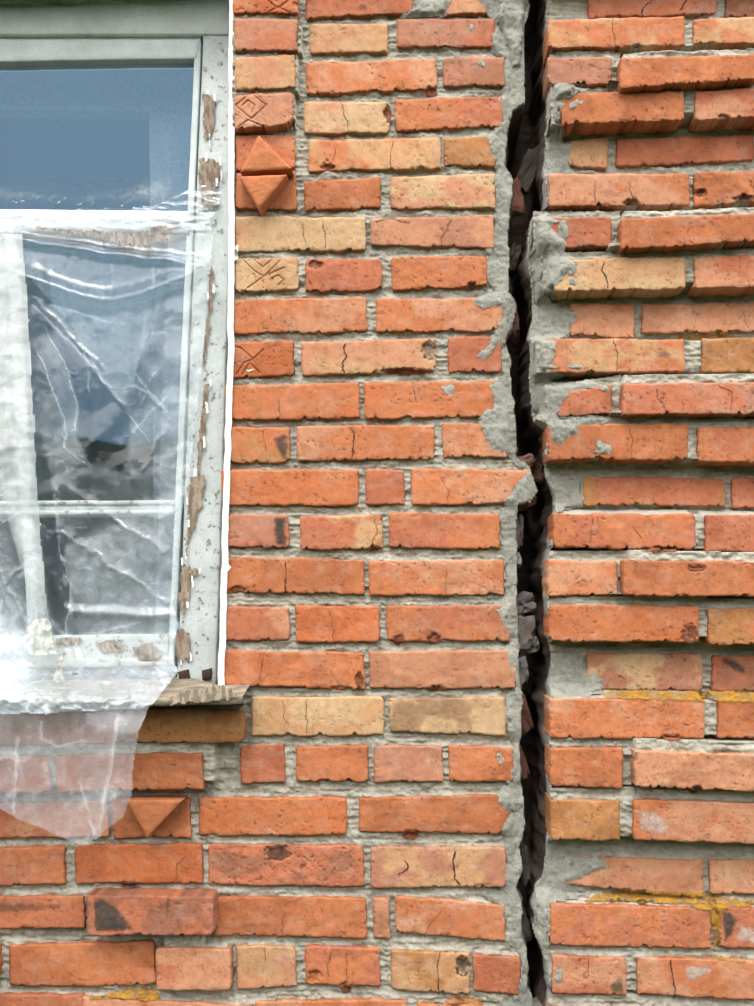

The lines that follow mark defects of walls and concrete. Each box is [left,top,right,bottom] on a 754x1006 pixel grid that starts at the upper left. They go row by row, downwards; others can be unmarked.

peeling [198,90,222,211]
peeling [201,265,216,367]
peeling [95,379,211,665]
crack [504,0,558,1006]